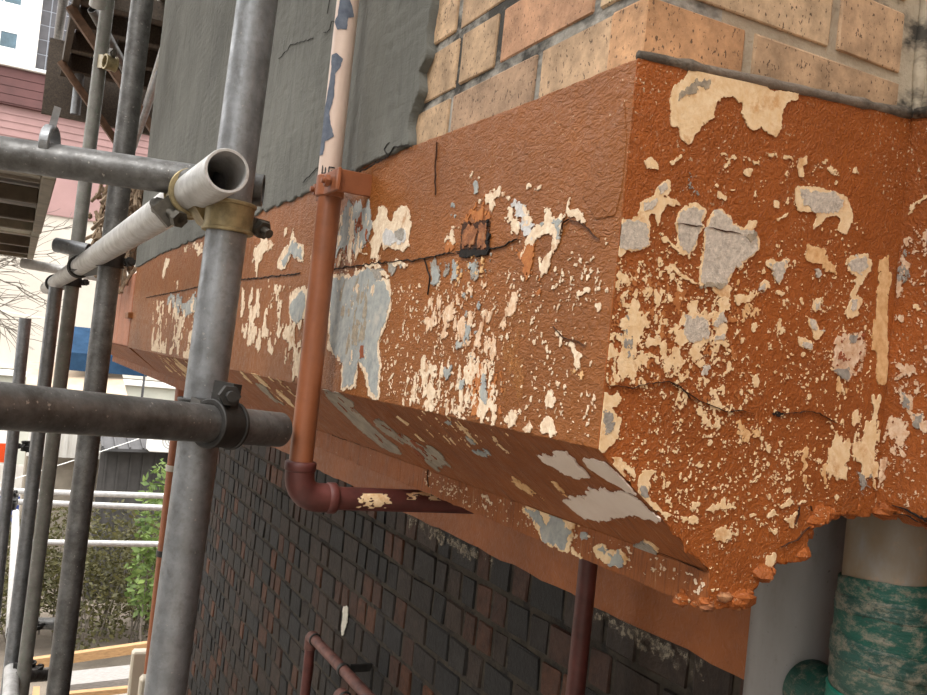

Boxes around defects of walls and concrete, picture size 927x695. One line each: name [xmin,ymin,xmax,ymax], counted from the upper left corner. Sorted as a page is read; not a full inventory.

peeling [335,0,354,30]
peeling [319,53,343,156]
peeling [669,70,799,145]
crack [359,142,413,172]
crack [432,142,440,195]
crack [559,219,597,238]
crack [241,272,300,280]
crack [334,238,517,295]
peeling [151,281,197,377]
peeling [240,227,311,408]
peeling [323,153,927,613]
crack [612,381,755,414]